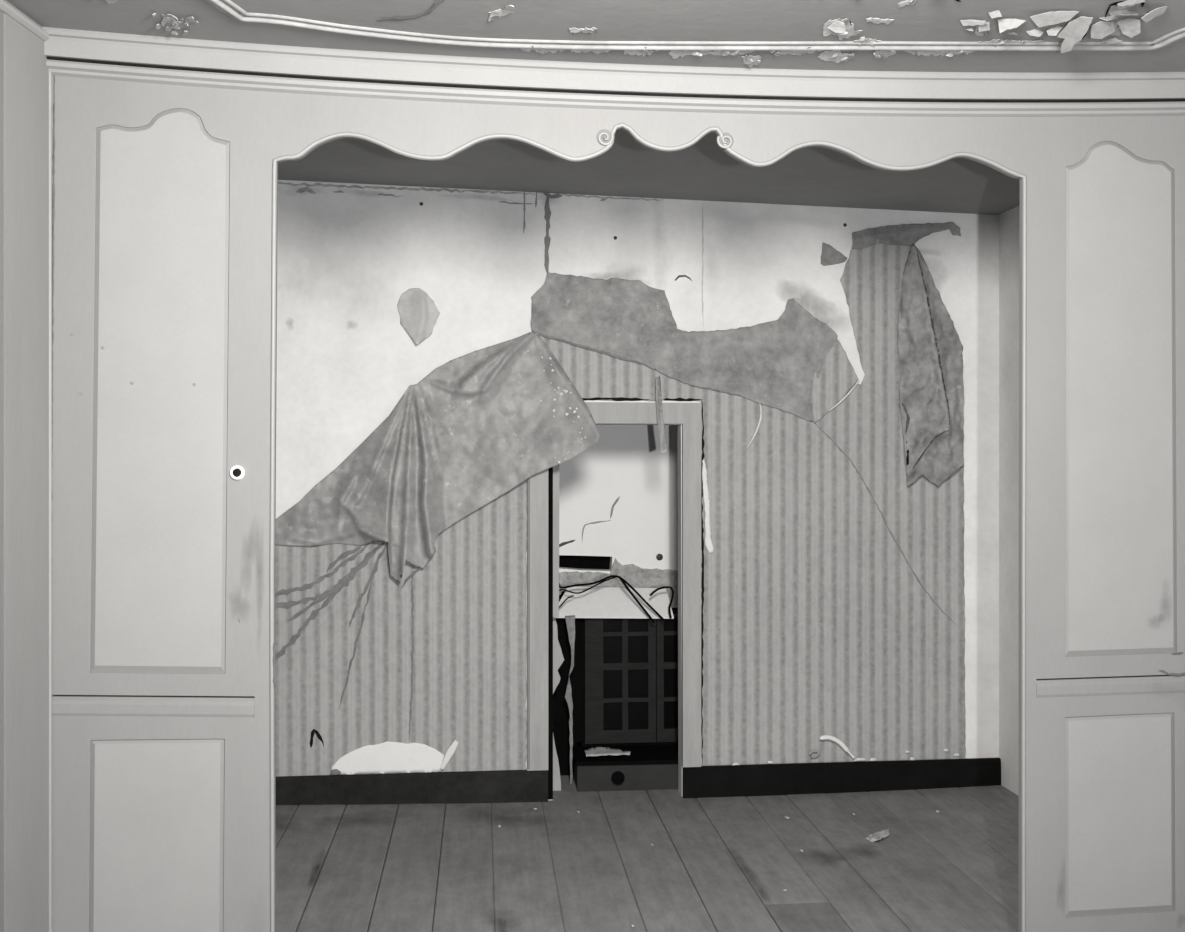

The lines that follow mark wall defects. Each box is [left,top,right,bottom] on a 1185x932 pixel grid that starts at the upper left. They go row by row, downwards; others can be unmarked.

crack [376,0,445,21]
peeling [624,0,1168,69]